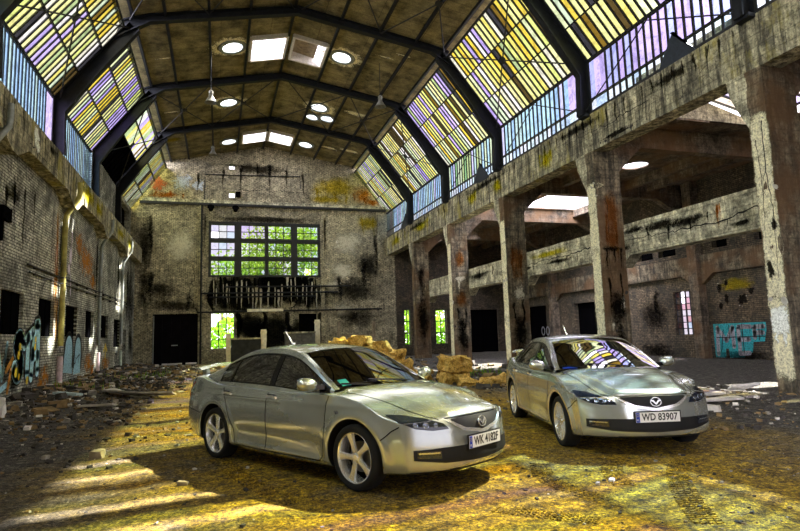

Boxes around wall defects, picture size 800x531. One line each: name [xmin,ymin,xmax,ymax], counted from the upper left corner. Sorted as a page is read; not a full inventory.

water stain [641,53,696,105]
water stain [538,97,626,159]
water stain [222,164,290,189]
crack [517,120,779,278]